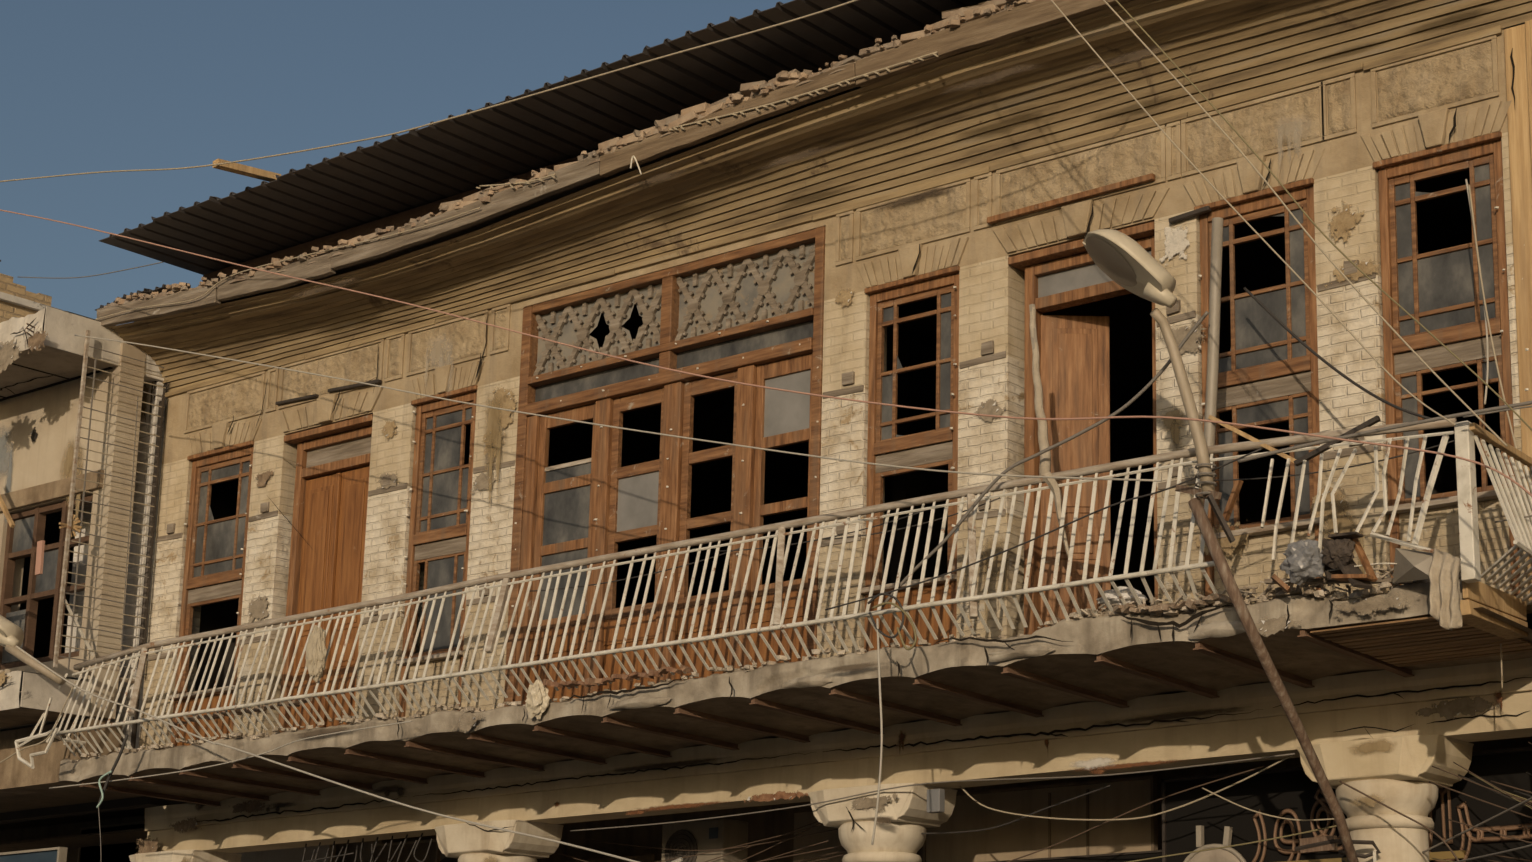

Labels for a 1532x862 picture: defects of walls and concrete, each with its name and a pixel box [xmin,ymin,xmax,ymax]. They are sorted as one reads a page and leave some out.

crack [1508,48,1516,105]
crack [1449,108,1457,141]
peeling [1328,201,1364,245]
peeling [1159,225,1190,266]
crack [1121,605,1232,644]
peeling [1416,696,1503,720]
crack [197,675,1532,832]